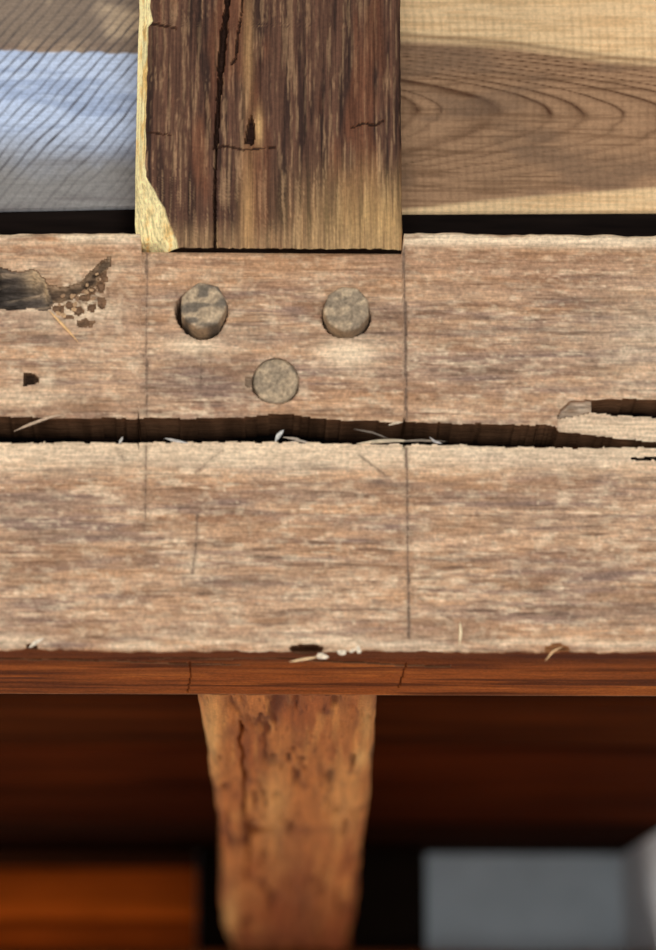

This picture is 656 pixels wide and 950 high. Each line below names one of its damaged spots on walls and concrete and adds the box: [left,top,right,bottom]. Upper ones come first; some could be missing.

crack [212,0,244,248]
spalling [0,256,111,328]
crack [0,398,656,461]